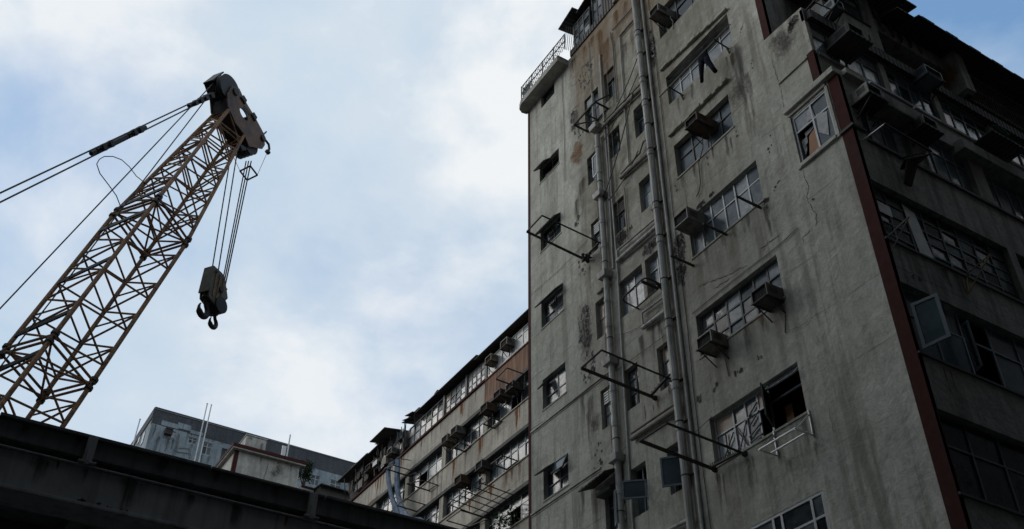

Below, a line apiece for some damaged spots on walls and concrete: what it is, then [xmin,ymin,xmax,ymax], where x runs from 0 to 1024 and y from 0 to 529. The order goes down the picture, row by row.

crack [698,170,817,289]
spalling [578,305,595,384]